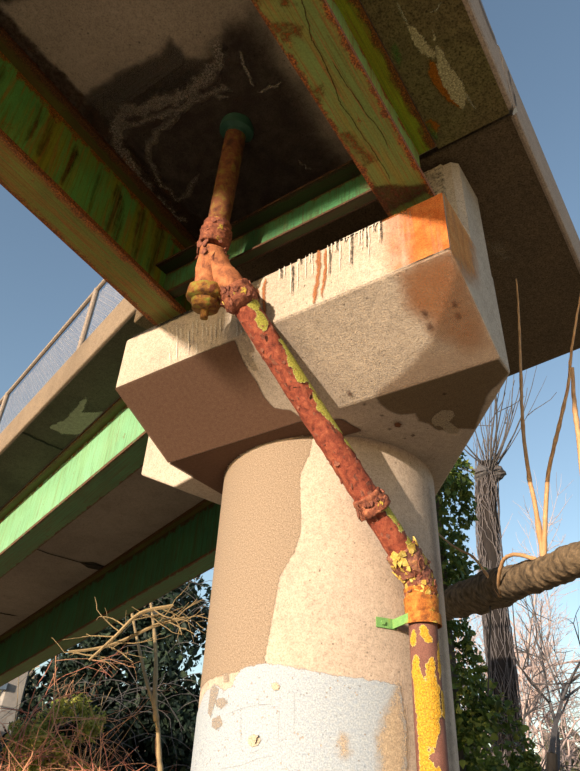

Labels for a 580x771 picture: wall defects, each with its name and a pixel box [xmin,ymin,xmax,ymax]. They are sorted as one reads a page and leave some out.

water stain [85,25,344,226]
corrosion [195,218,232,261]
water stain [279,254,313,295]
corrosion [313,249,327,304]
water stain [327,220,382,273]
corrosion [374,184,479,346]
corrosion [218,278,316,415]
corrosion [323,444,390,524]
crack [37,549,104,570]
corrosion [393,539,438,598]